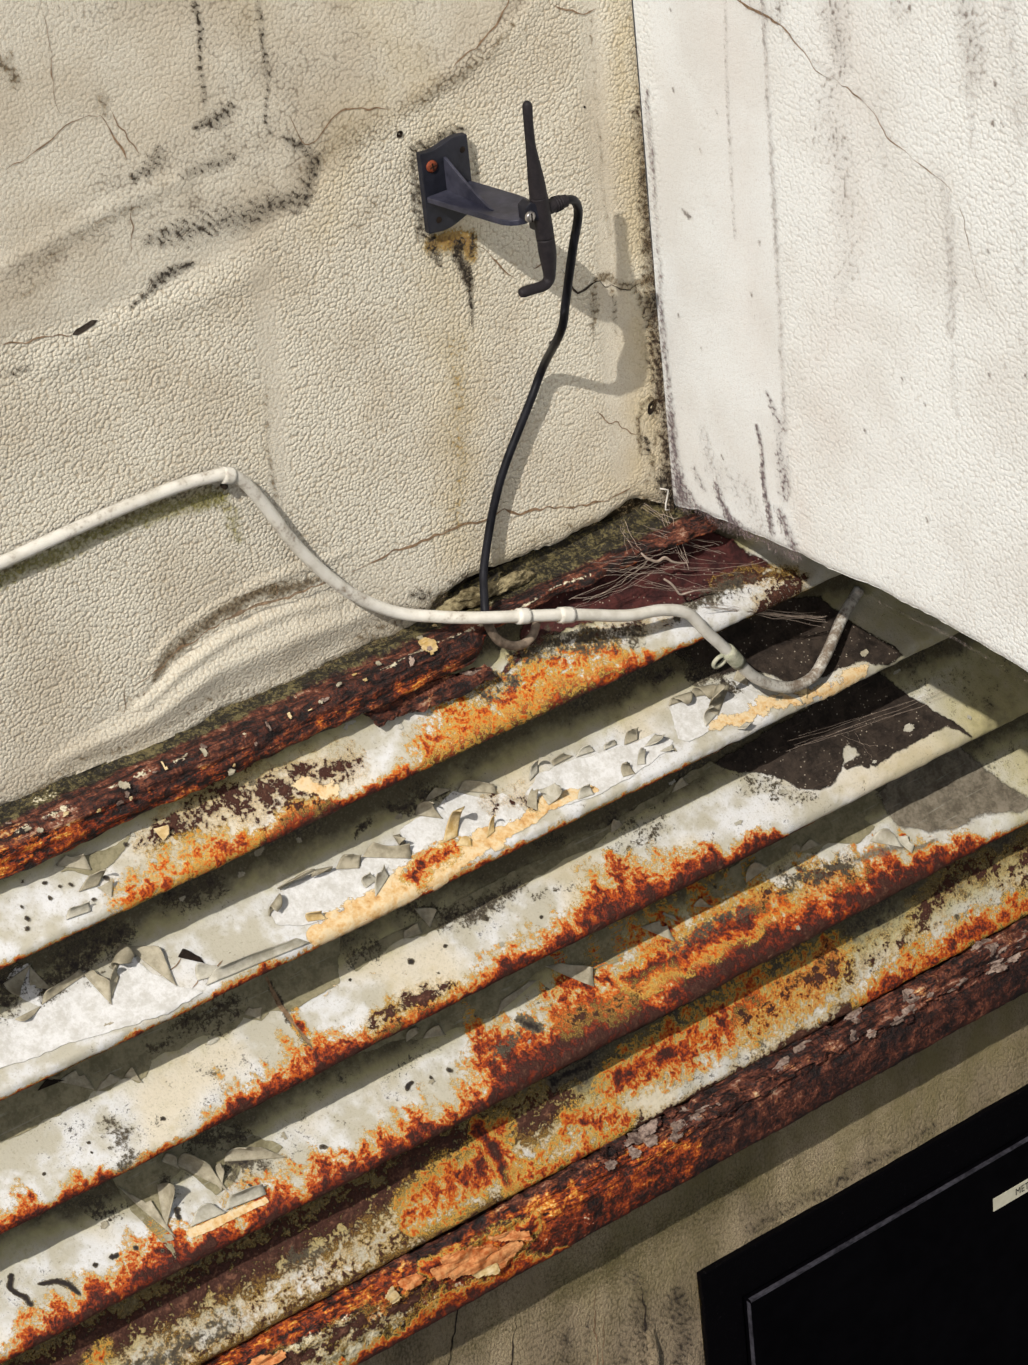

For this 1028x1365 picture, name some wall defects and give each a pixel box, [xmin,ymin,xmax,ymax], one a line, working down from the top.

crack [3,320,98,345]
crack [7,14,139,169]
water stain [131,0,326,308]
corrosion [425,227,478,327]
water stain [590,35,801,560]
crack [737,0,998,317]
corrosion [0,532,869,1101]
peeling [0,596,1028,1141]
water stain [475,621,648,706]
spalling [6,1273,81,1307]
peeling [113,1124,287,1258]
corrosion [0,821,1028,1365]